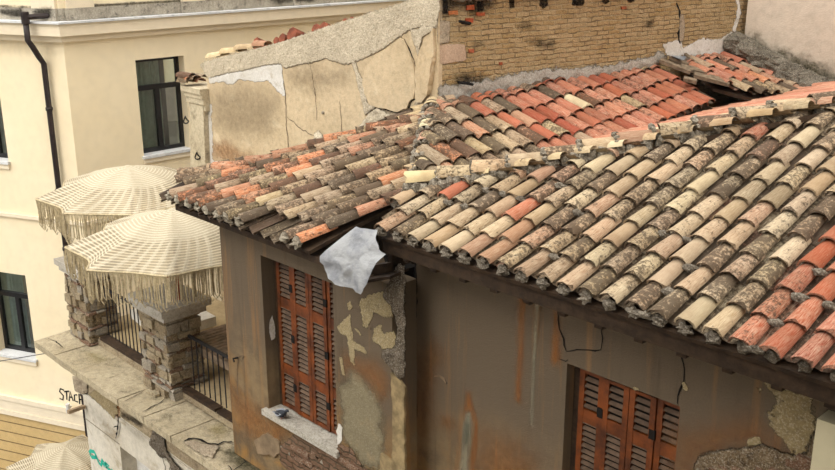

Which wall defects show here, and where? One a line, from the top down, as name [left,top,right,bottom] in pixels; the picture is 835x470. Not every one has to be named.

damp [1,5,51,17]
peeling [663,0,742,56]
crack [283,65,317,136]
spalling [175,0,440,130]
peeling [254,263,407,470]
crack [557,315,603,362]
crack [114,391,165,436]
peeling [694,382,817,470]